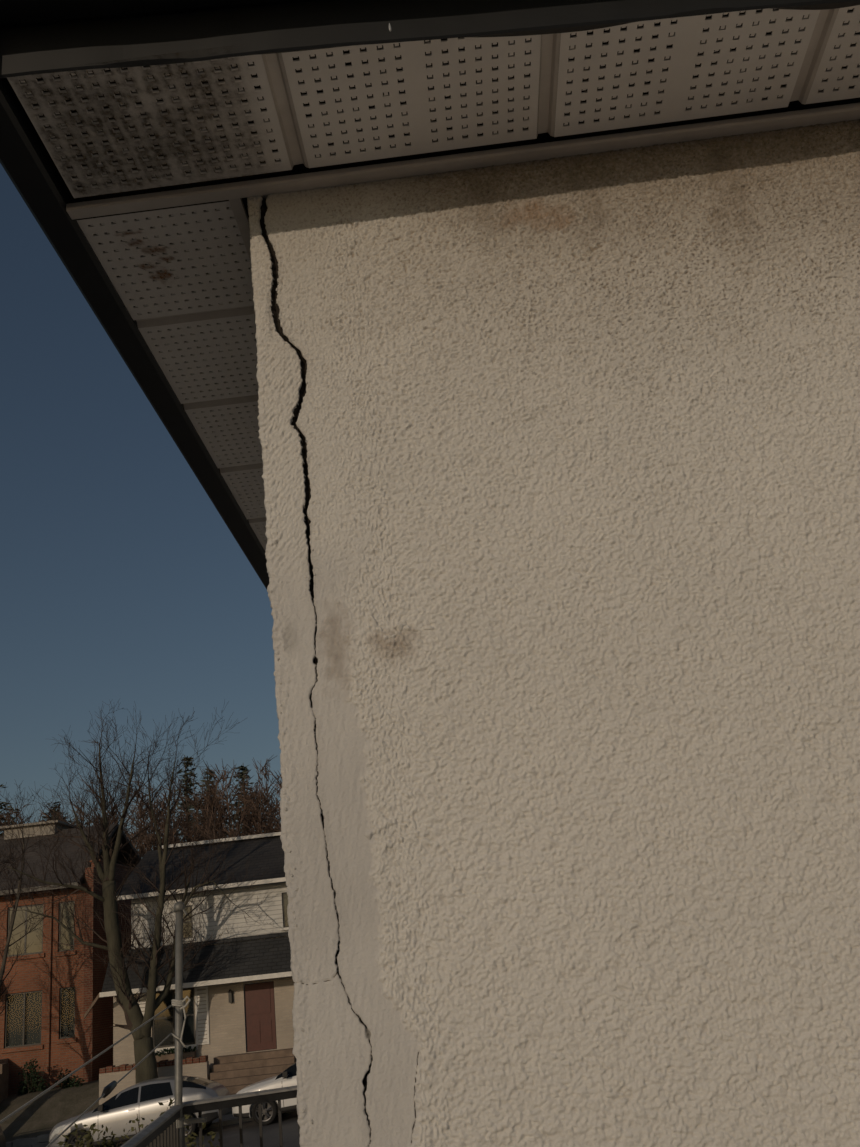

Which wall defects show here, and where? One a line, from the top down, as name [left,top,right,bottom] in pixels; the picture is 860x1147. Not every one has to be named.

water stain [16,48,264,196]
crack [260,197,373,1146]